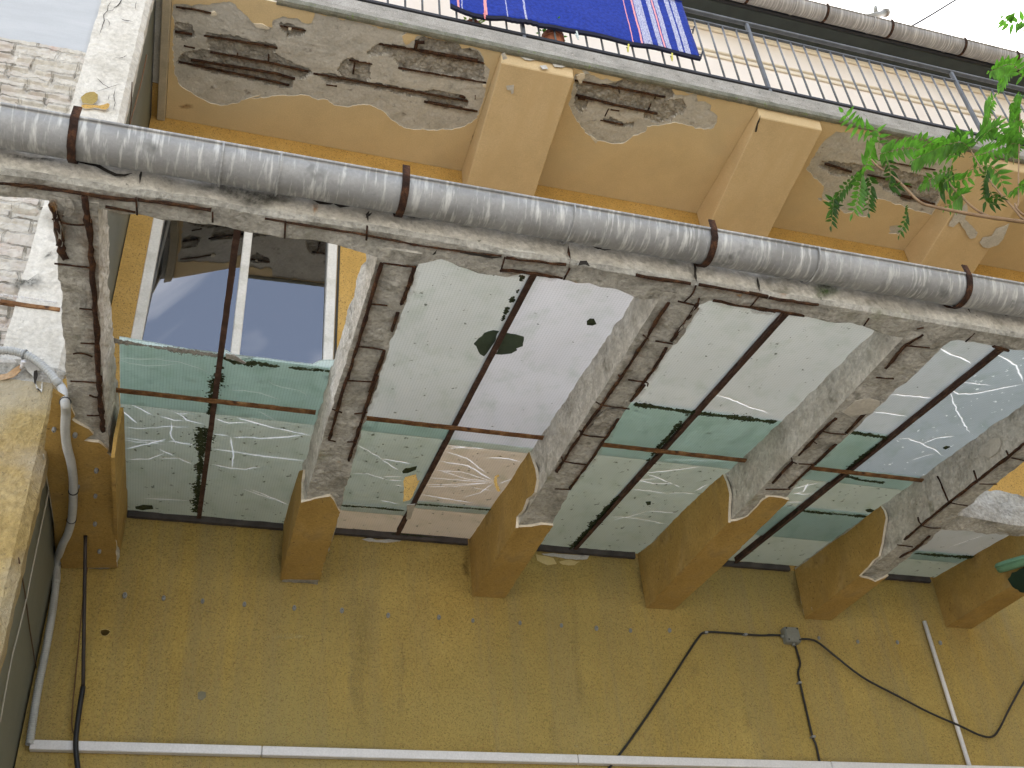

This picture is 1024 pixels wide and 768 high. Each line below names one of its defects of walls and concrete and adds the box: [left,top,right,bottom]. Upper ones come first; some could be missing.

spalling [168,2,490,130]
spalling [522,57,717,143]
spalling [806,132,952,217]
spalling [587,409,619,436]
corrosion [555,273,819,490]
corrosion [765,414,866,490]
corrosion [876,327,930,380]